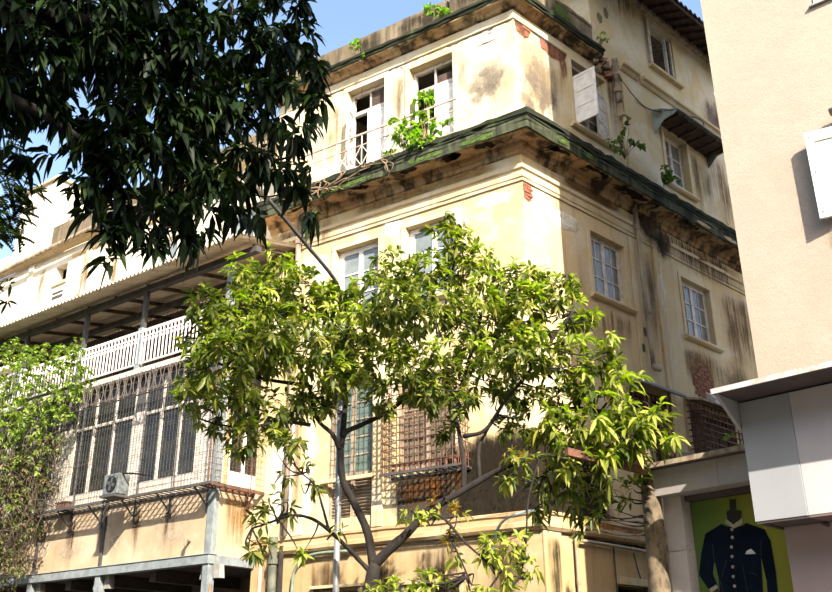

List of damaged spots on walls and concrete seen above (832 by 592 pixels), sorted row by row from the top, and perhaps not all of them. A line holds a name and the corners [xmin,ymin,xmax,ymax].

spalling [514,18,531,39]
spalling [539,38,567,63]
damp [484,65,503,91]
damp [522,53,555,114]
damp [443,153,462,163]
damp [358,167,490,212]
peeling [476,181,578,232]
damp [565,179,619,210]
spalling [690,359,714,399]